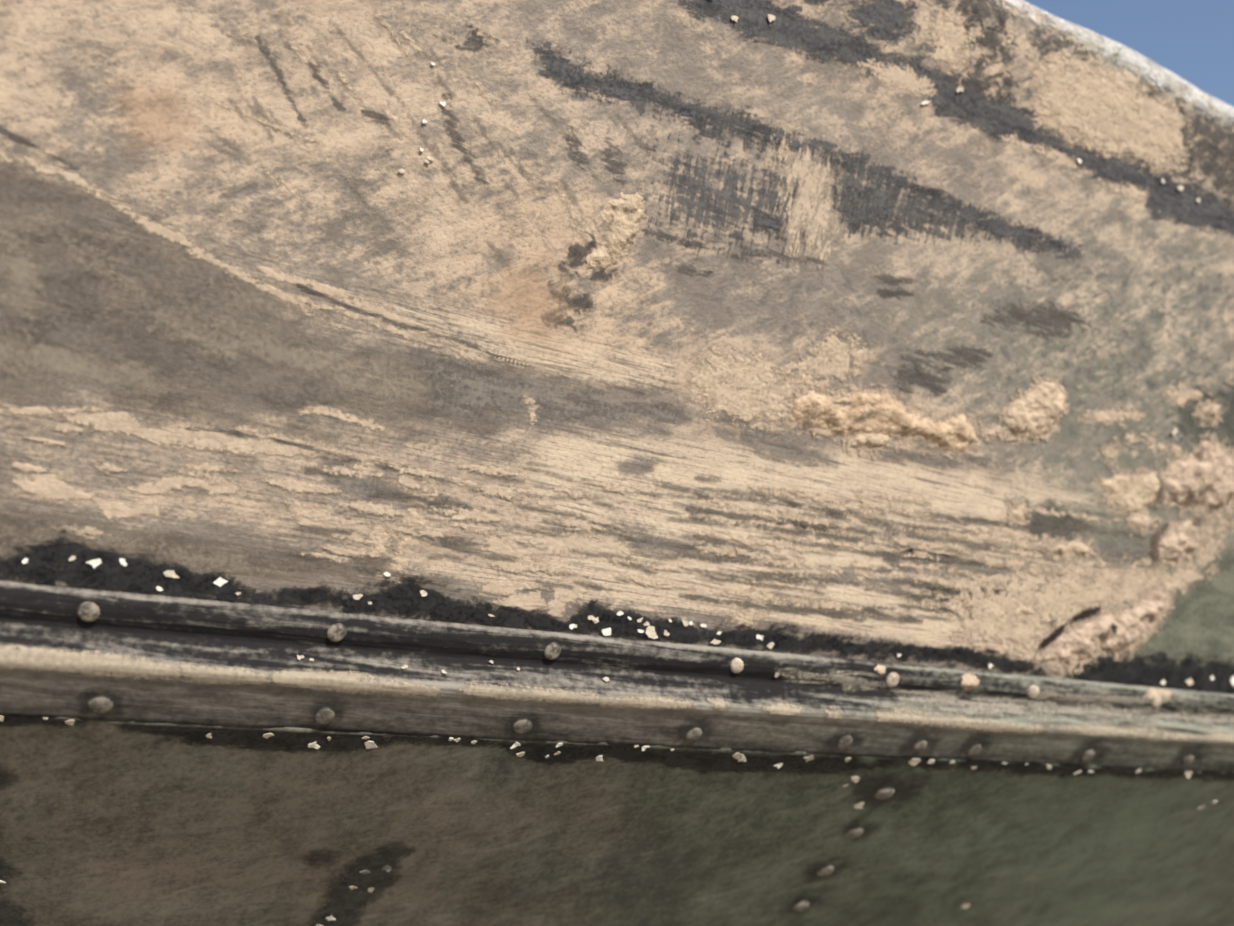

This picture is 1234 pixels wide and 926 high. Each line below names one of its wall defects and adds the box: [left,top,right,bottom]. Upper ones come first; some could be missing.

damp [875,448,1014,472]
damp [0,512,448,585]
damp [297,457,1155,630]
peeling [0,530,1234,695]
crack [1039,606,1117,649]
damp [308,843,416,926]